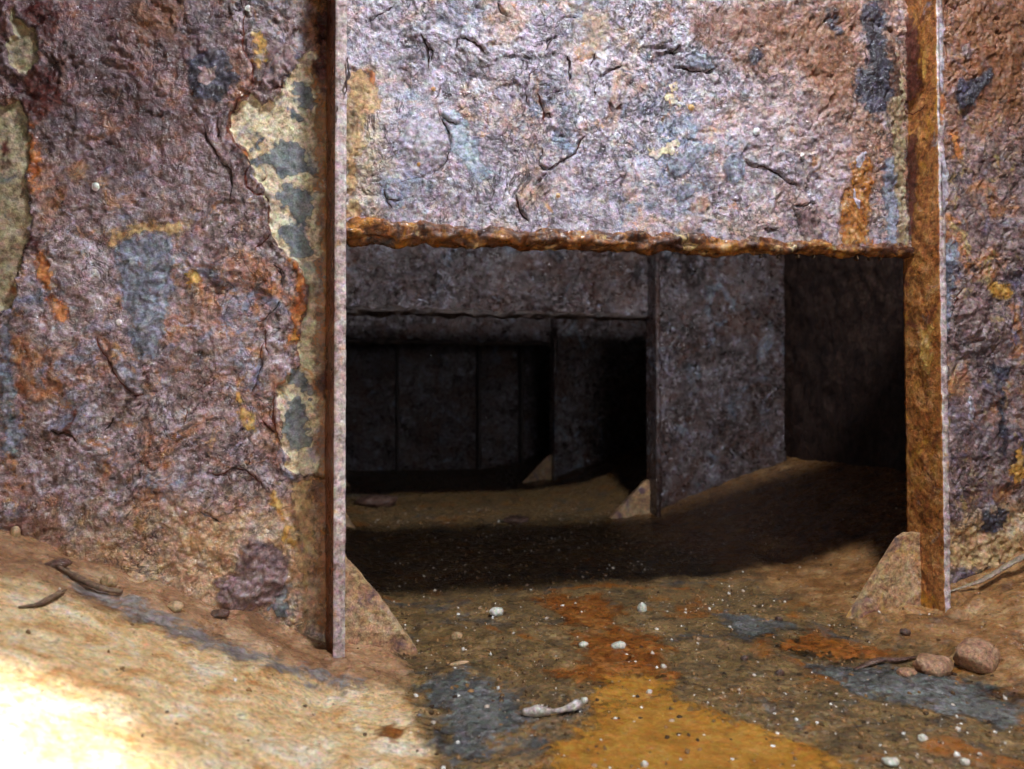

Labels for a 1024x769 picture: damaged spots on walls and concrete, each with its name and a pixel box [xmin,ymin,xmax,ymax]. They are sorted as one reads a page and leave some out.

peeling [6,8,39,75]
crack [421,34,485,68]
crack [525,17,621,123]
corrosion [905,17,928,101]
peeling [0,101,43,311]
crack [203,0,283,446]
crack [539,136,585,182]
crack [742,158,817,231]
corrosion [839,151,875,245]
corrosion [905,133,918,236]
peeling [229,40,327,593]
corrosion [919,325,934,373]